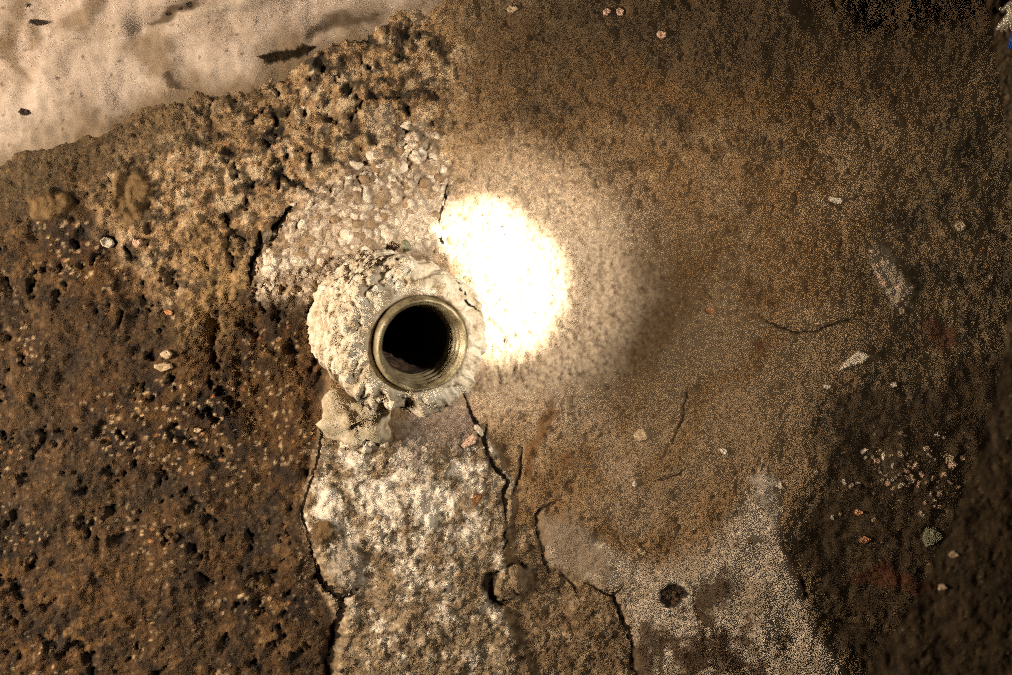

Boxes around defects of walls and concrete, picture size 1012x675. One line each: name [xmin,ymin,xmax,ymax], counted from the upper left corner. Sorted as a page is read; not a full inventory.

spalling [100,237,115,248]
spalling [263,131,453,296]
spalling [154,350,173,372]
crack [756,313,869,334]
crack [300,431,359,675]
peeling [310,488,364,587]
peeling [338,448,488,553]
spalling [461,424,484,448]
crack [463,394,522,550]
crack [535,504,640,675]